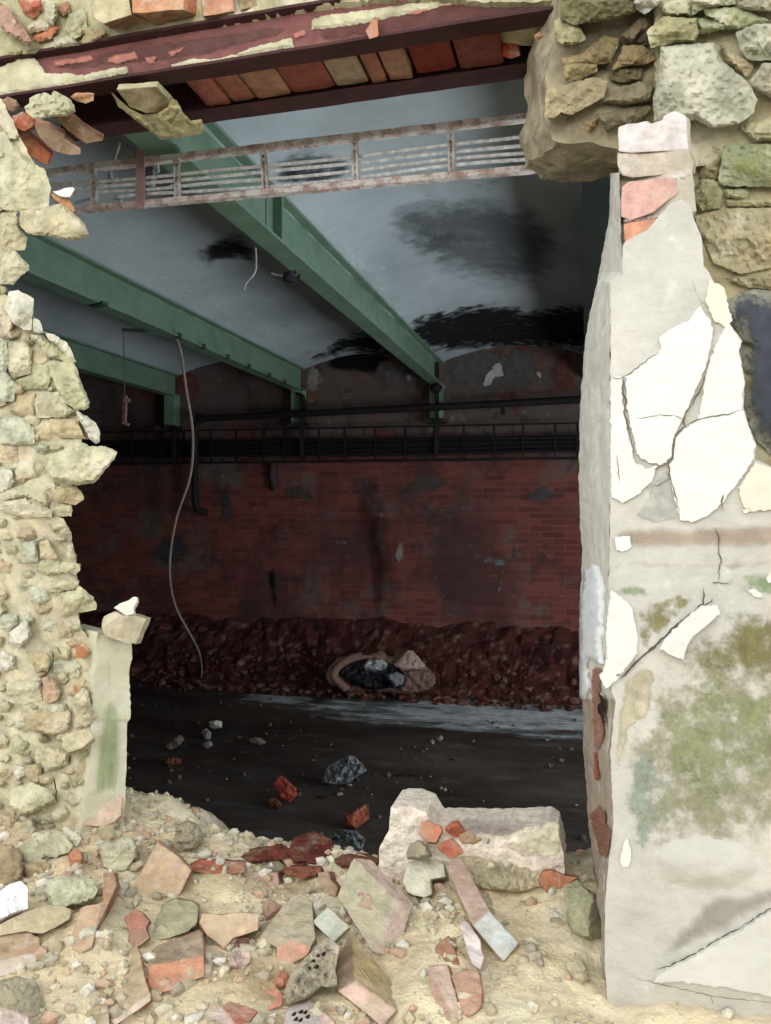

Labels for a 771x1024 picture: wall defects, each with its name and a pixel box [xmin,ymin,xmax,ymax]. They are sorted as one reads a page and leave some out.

rust [60,28,283,68]
rust [321,4,540,39]
water stain [406,211,548,274]
crack [611,351,740,520]
flaking render [609,280,771,522]
crack [621,494,728,679]
flaking render [748,574,771,598]
crack [636,908,771,1003]